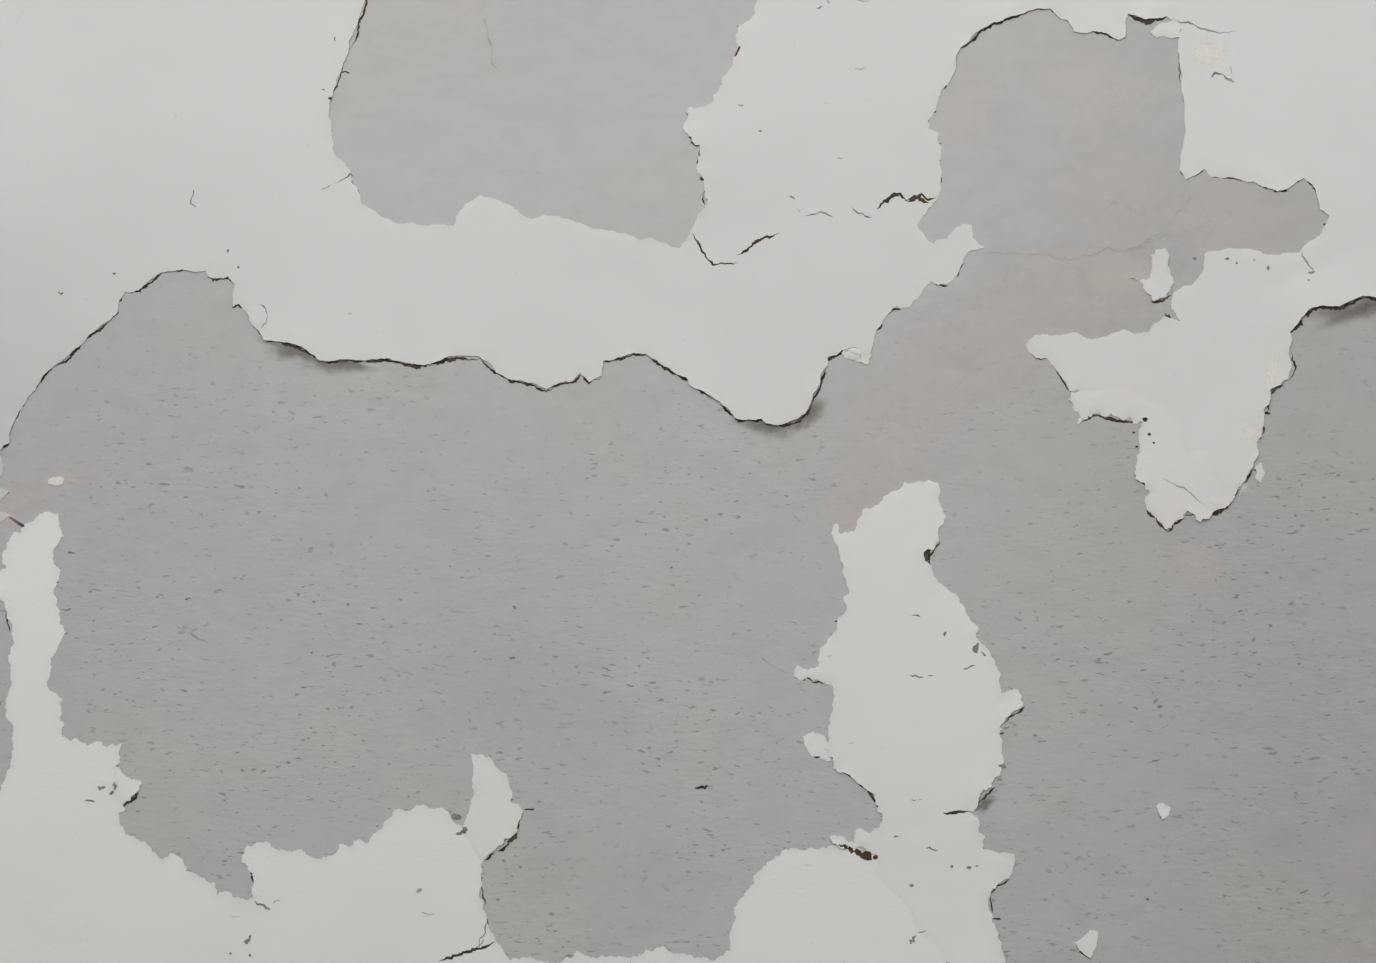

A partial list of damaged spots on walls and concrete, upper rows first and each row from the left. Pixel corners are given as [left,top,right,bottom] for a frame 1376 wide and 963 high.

peeling [322,0,757,248]
peeling [0,269,908,963]
peeling [855,8,1376,963]